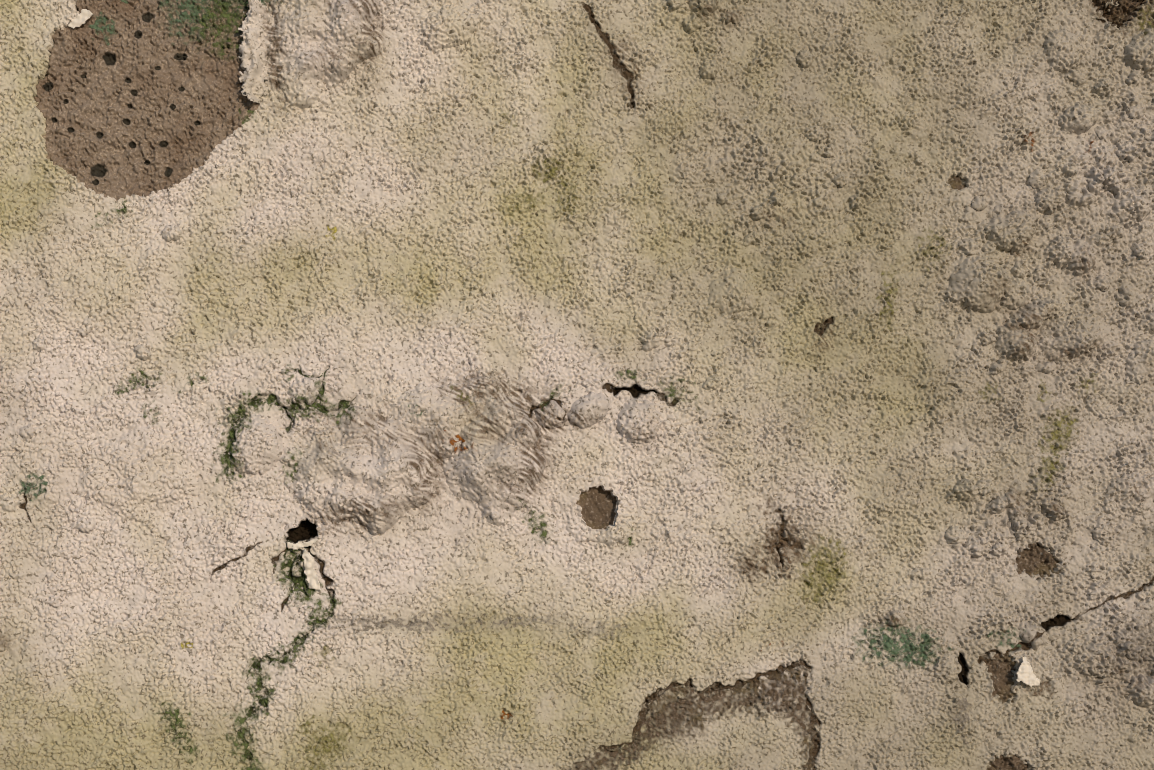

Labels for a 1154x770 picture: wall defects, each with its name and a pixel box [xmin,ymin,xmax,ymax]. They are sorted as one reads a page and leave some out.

spalling [34,0,272,201]
crack [582,2,635,108]
spalling [1092,0,1154,35]
crack [216,366,356,482]
crack [602,383,680,406]
spalling [576,486,617,529]
spalling [1012,543,1065,578]
crack [212,519,341,770]
crack [958,577,1154,687]
peeling [575,661,818,770]
spalling [987,754,1028,770]